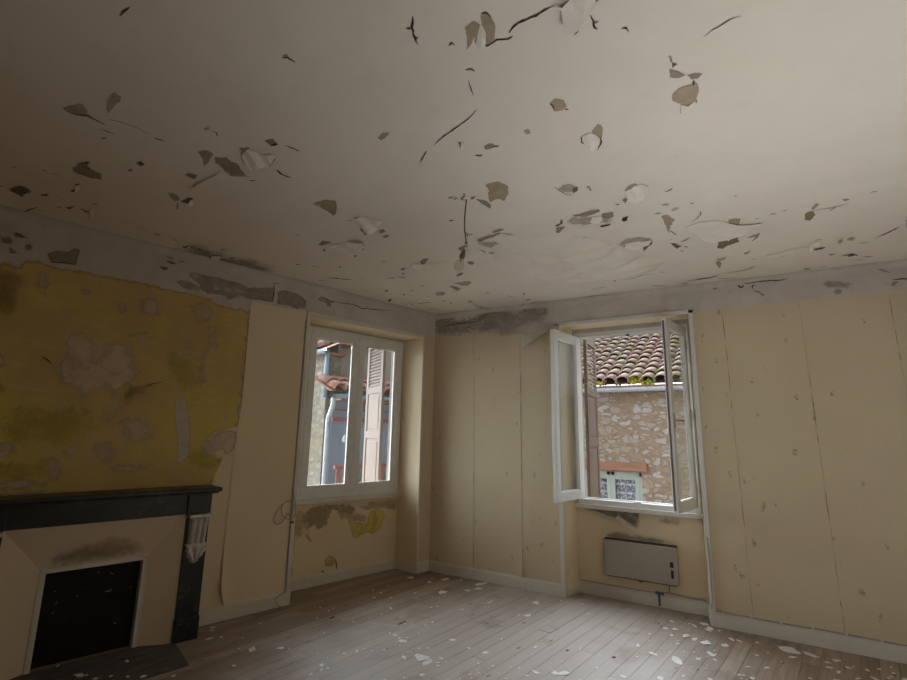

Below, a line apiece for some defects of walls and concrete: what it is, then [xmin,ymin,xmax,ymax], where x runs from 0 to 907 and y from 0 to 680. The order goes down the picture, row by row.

crack [406,17,418,44]
peeling [465,12,495,51]
peeling [555,0,599,35]
peeling [669,56,702,115]
peeling [64,104,105,125]
crack [421,69,475,161]
peeling [620,238,652,251]
damp [0,249,250,495]
peeling [175,397,190,463]